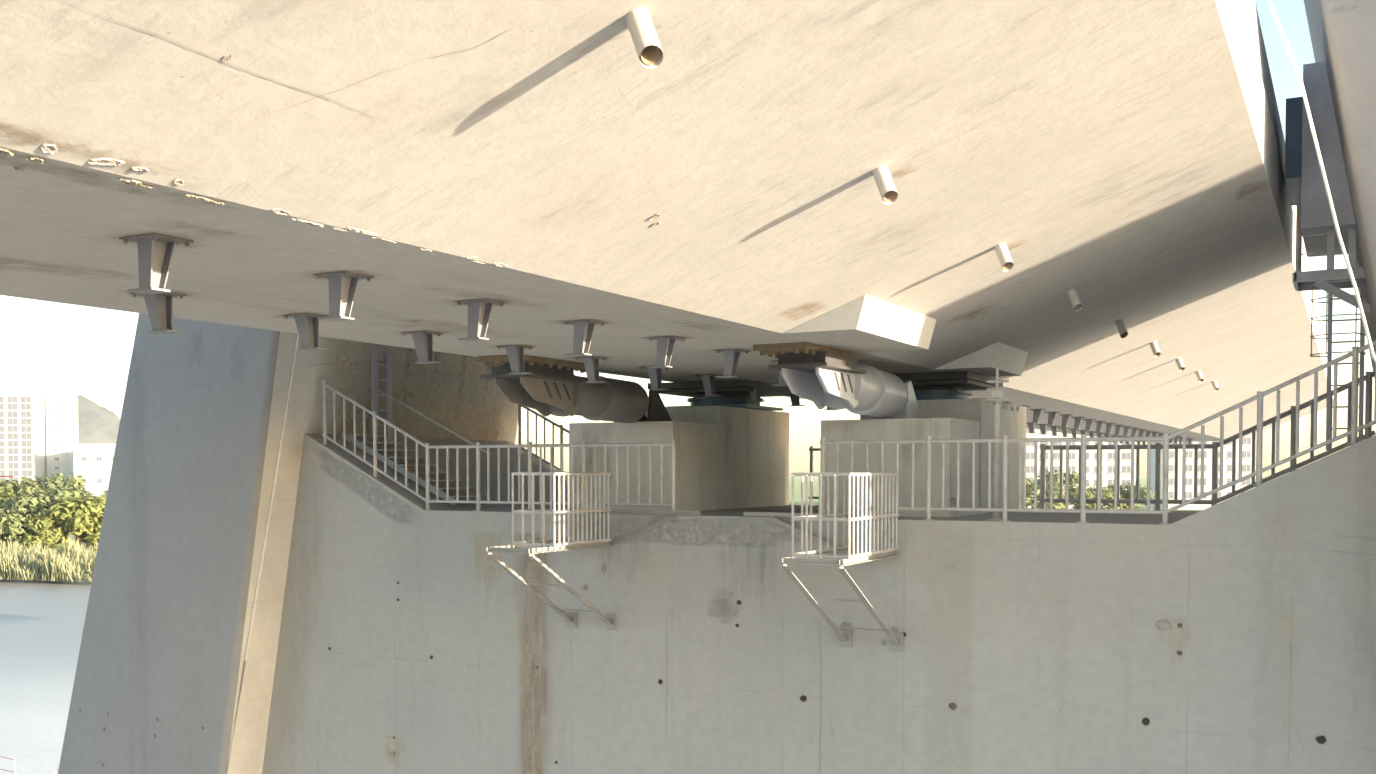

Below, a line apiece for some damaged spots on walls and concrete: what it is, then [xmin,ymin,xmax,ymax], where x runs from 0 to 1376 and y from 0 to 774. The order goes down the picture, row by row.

crack [62,0,511,118]
spalling [0,143,69,171]
spalling [88,157,155,189]
spalling [173,179,224,206]